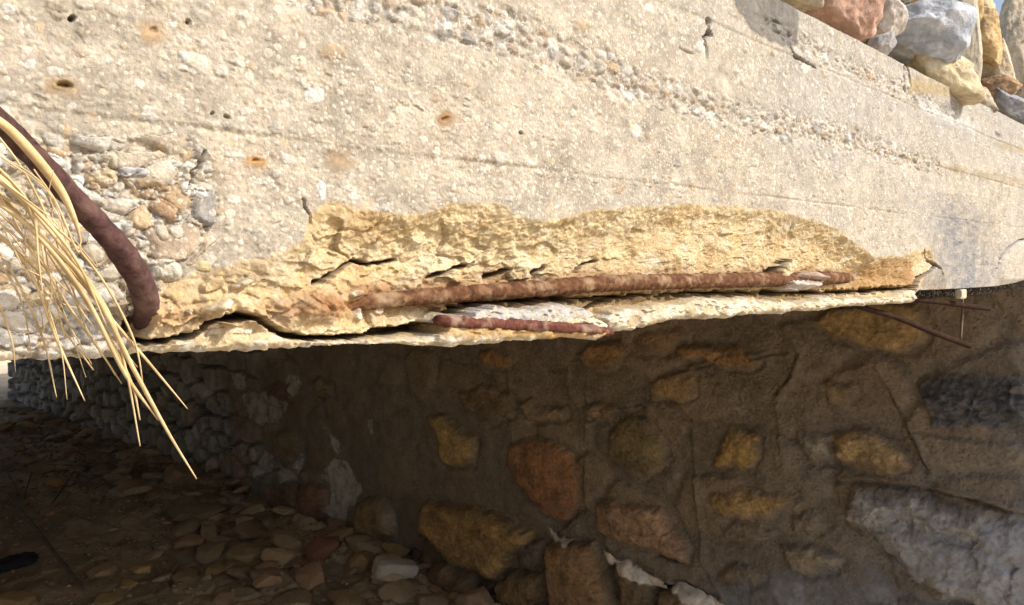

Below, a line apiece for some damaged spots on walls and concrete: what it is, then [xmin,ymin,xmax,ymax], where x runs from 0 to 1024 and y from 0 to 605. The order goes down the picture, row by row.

corrosion [247,156,265,165]
spalling [0,107,973,355]
crack [311,258,397,284]
crack [426,263,544,280]
crack [572,260,599,273]
corrosion [303,297,345,315]
corrosion [405,324,606,339]